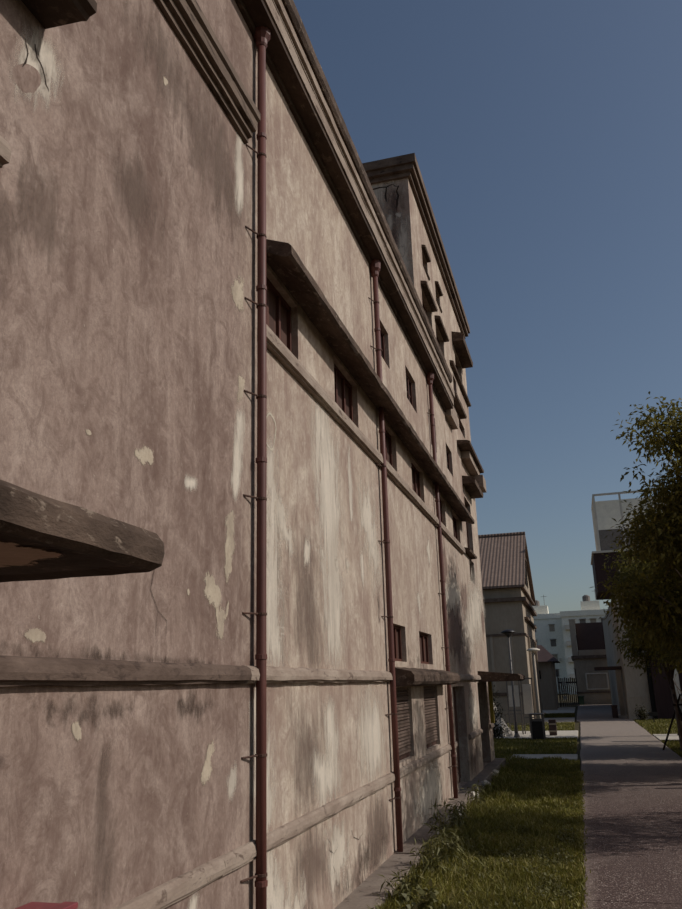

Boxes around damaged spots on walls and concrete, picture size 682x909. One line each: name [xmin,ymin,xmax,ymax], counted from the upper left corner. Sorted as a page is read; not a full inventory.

peeling [235,135,243,213]
crack [373,184,399,244]
peeling [135,446,154,465]
peeling [185,477,197,490]
peeling [231,411,245,498]
peeling [0,542,61,568]
peeling [204,510,236,640]
damp [266,412,293,667]
damp [297,402,380,662]
damp [267,849,311,909]
damp [325,803,385,893]